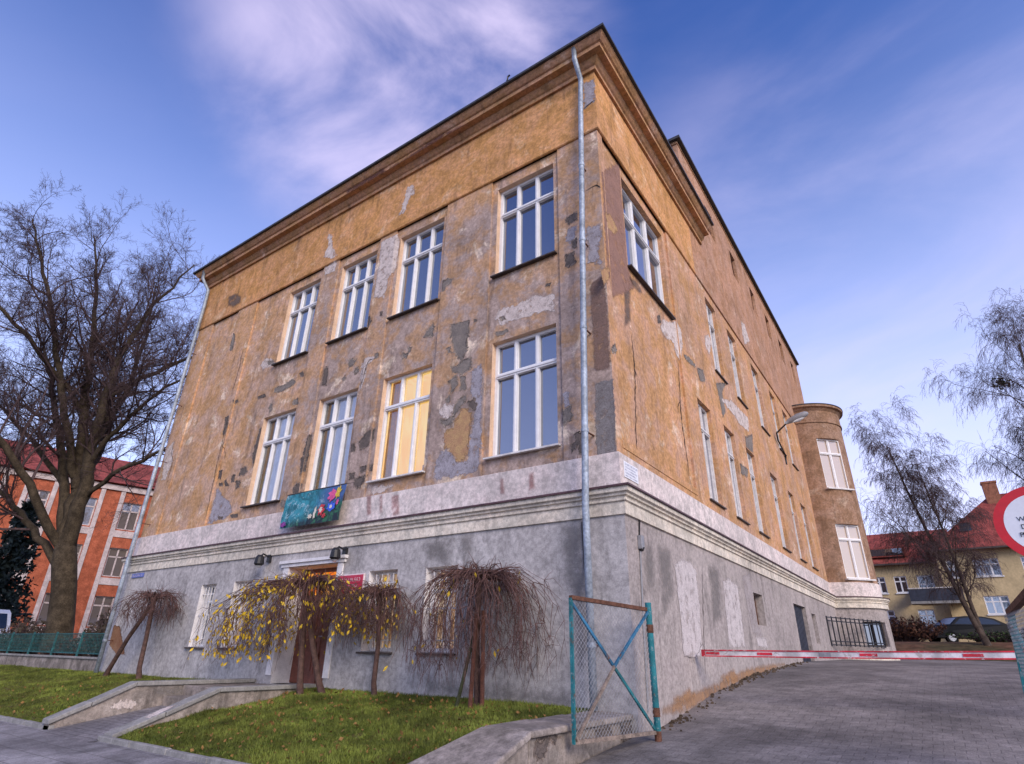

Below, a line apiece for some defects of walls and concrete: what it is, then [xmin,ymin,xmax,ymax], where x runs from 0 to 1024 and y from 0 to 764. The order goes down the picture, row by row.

peeling [399,185,415,215]
peeling [373,234,400,298]
peeling [494,282,555,336]
spalling [439,320,478,462]
crack [630,335,638,446]